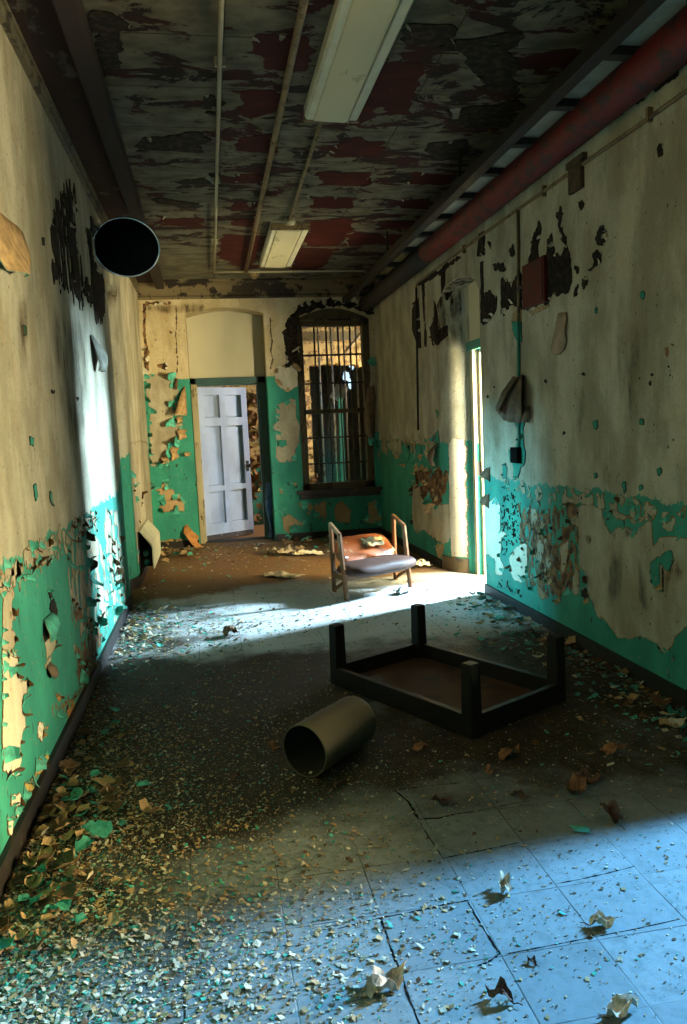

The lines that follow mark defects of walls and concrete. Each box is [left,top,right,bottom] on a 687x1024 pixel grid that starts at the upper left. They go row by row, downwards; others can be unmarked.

peeling [360,61,425,116]
peeling [50,178,108,372]
peeling [290,172,434,273]
peeling [412,256,461,349]
peeling [477,206,608,325]
peeling [270,297,374,463]
peeling [0,301,203,836]
peeling [246,392,264,522]
peeling [364,357,687,656]
crack [389,783,529,859]
crack [557,866,634,884]
crack [337,900,678,1024]